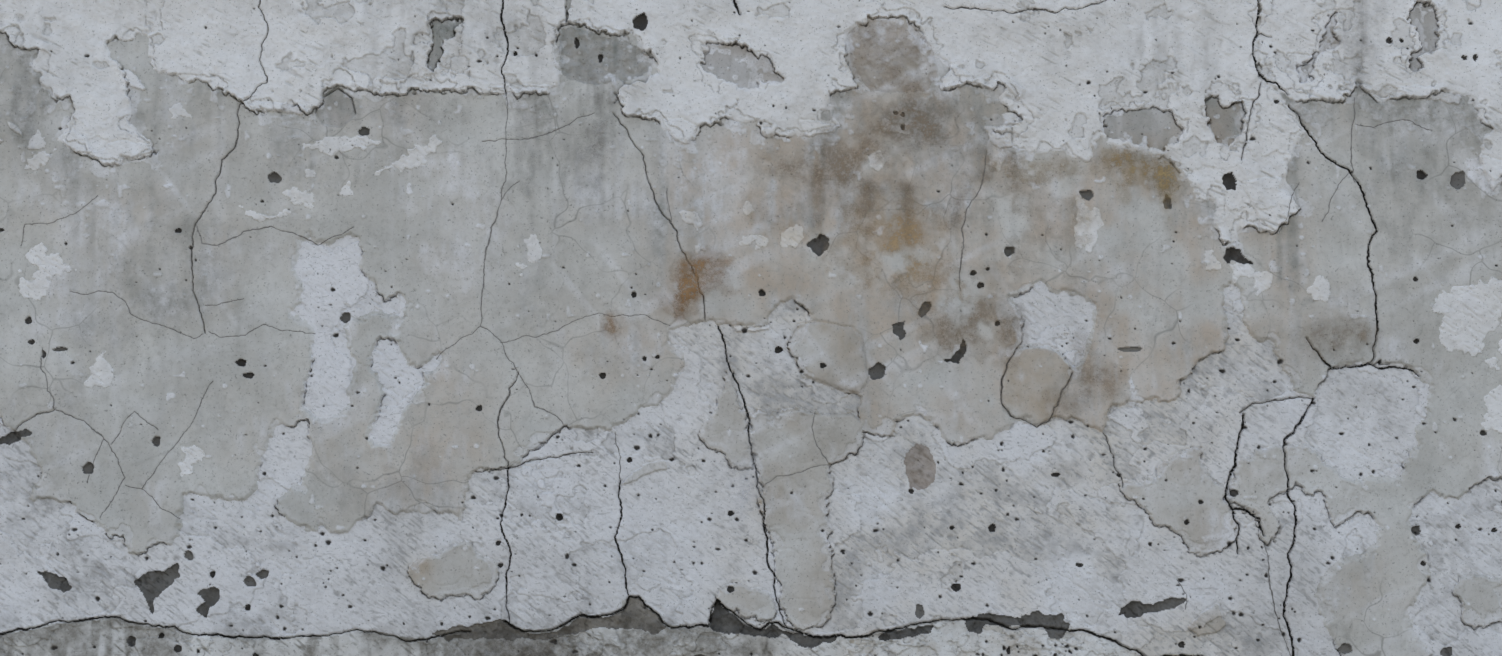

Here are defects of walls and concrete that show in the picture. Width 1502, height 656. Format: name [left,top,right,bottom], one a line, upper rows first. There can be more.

crack [21,195,98,246]
crack [15,348,213,519]
crack [71,0,353,339]
crack [0,616,471,642]
rust [675,259,709,311]
flaking render [0,234,1429,656]
peeling [0,0,1502,243]
crack [436,0,1203,656]
crack [1224,0,1432,656]
flaking render [1407,476,1502,656]